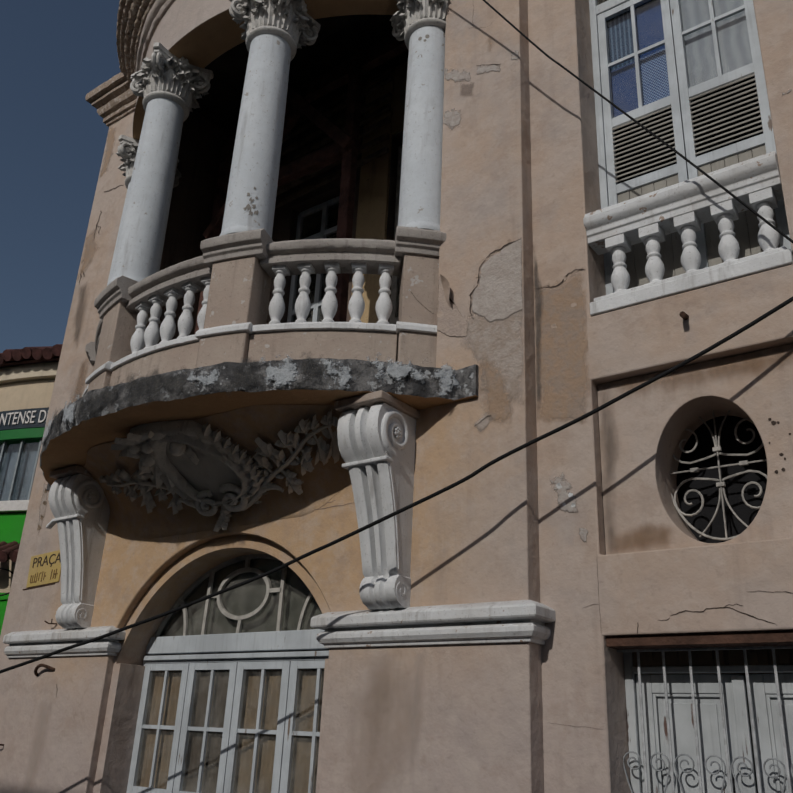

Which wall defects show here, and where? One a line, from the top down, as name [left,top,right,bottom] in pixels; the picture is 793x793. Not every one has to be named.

peeling [437,238,524,401]
water stain [78,370,187,418]
water stain [52,412,61,435]
peeling [550,473,578,513]
crack [660,604,775,624]